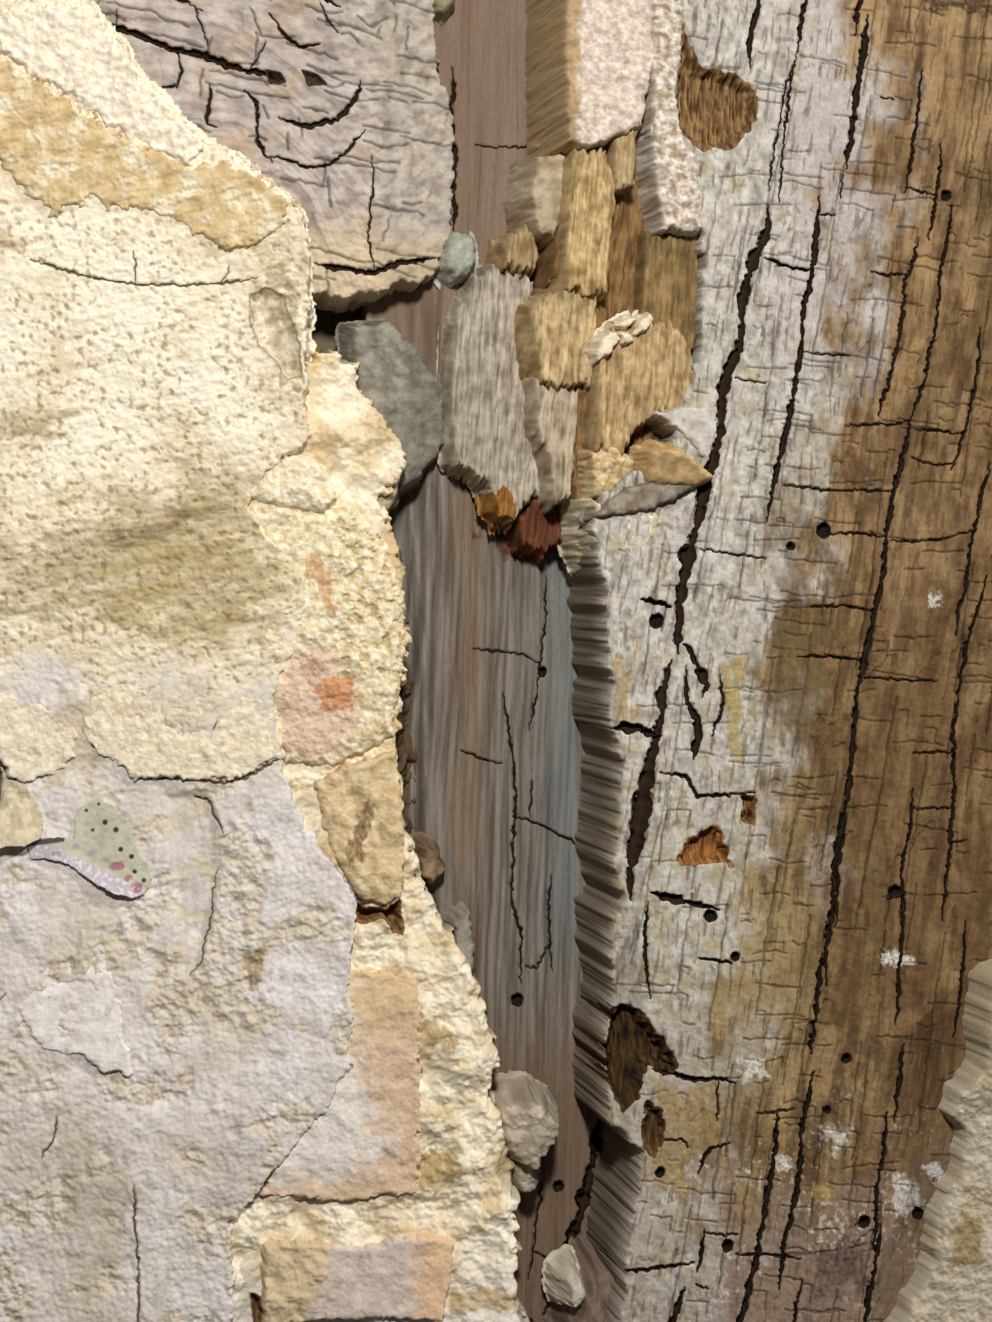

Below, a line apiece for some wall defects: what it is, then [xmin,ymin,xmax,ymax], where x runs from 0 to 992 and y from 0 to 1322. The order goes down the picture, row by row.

crack [111,0,436,275]
crack [31,251,257,287]
crack [528,0,991,1322]
spalling [314,676,357,713]
crack [0,762,16,800]
crack [138,760,277,833]
crack [460,575,575,984]
spalling [355,901,405,935]
crack [41,1116,57,1159]